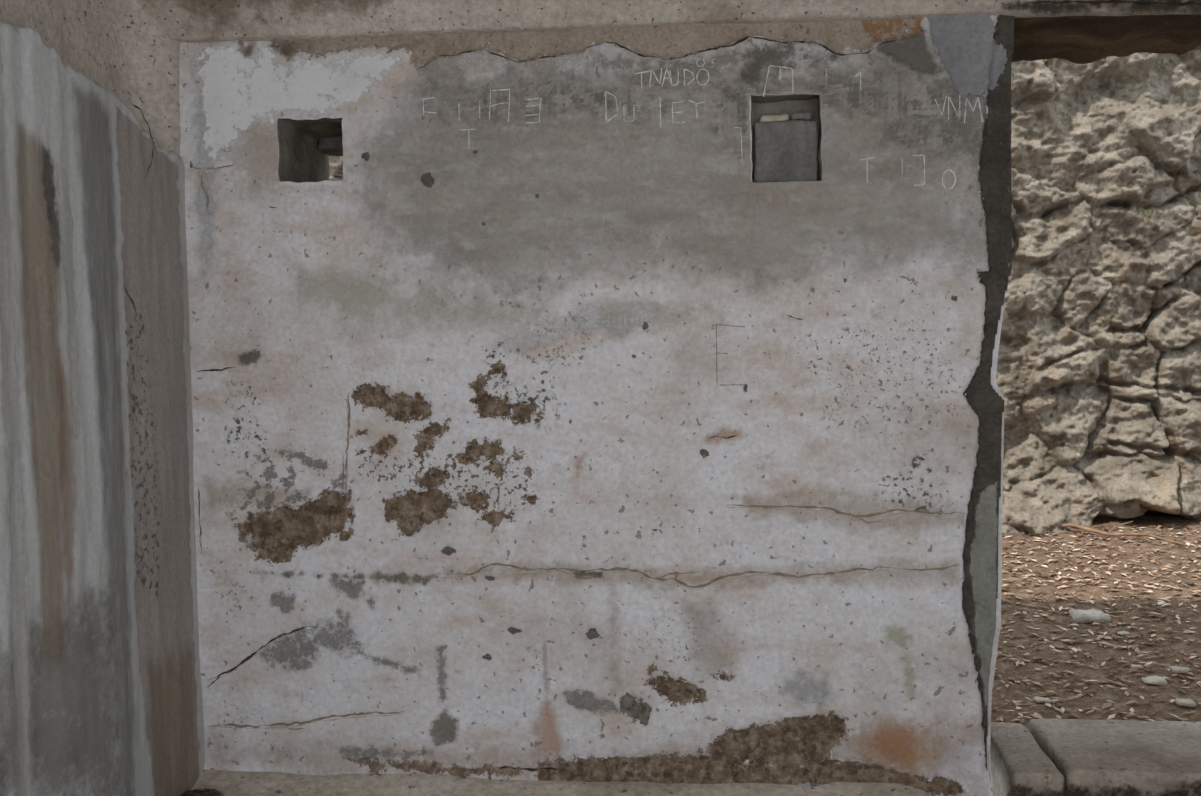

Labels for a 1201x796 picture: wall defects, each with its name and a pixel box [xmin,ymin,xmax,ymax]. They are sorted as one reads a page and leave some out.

damp [181,0,240,27]
damp [1002,0,1201,15]
peeling [233,15,1015,771]
crack [727,504,967,523]
crack [442,563,956,590]
crack [207,626,317,688]
crack [209,711,404,730]
spalling [343,709,963,796]